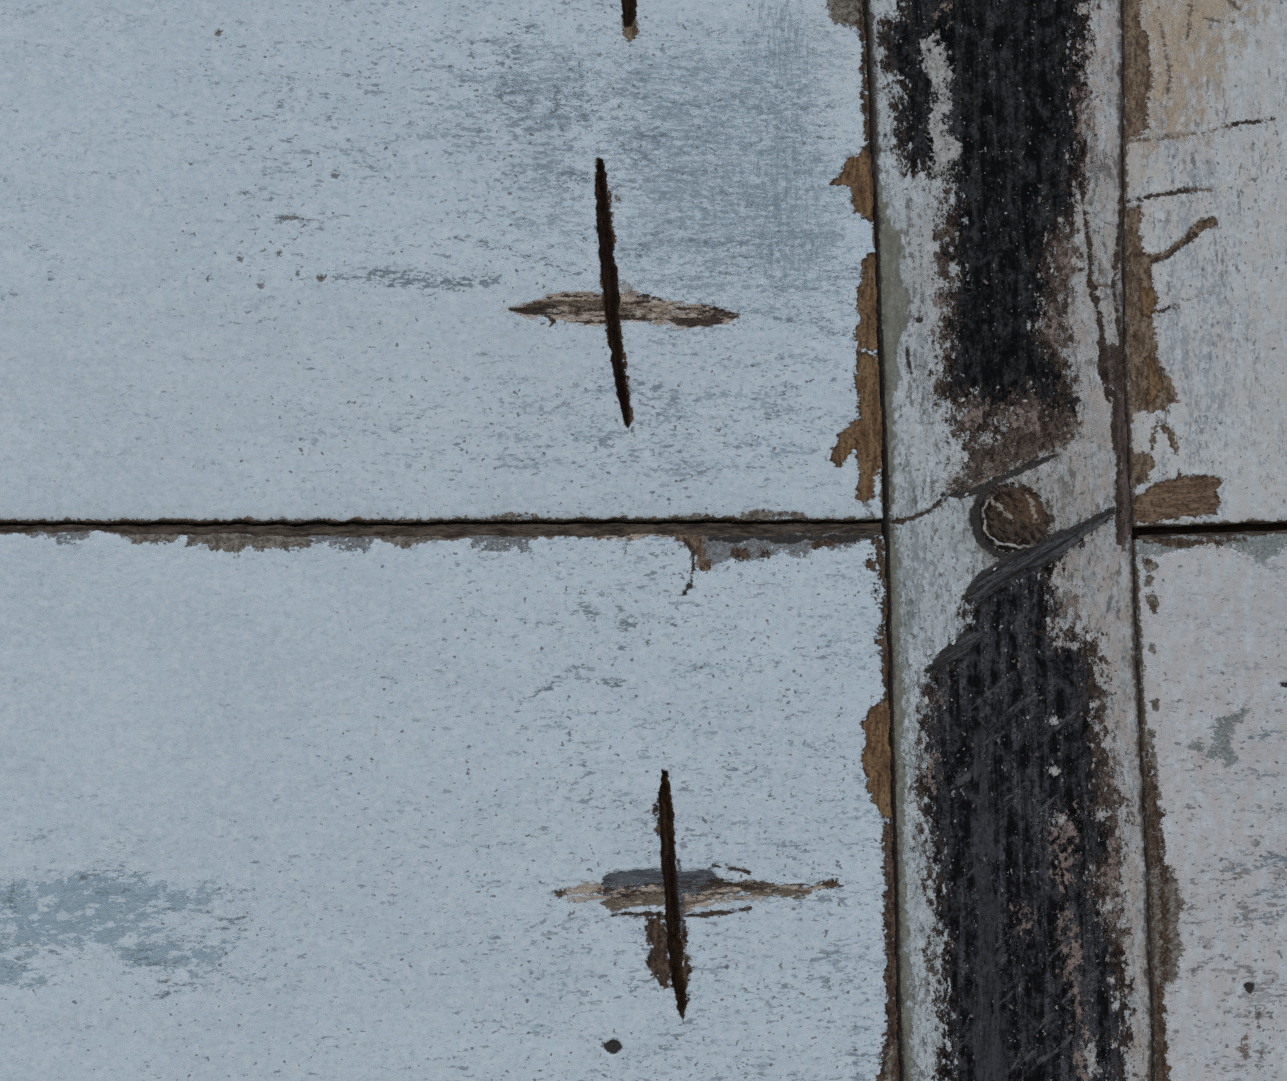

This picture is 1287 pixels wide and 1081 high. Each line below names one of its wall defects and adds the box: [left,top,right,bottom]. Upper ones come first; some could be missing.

crack [620,0,640,43]
peeling [1124,0,1156,139]
crack [503,157,740,428]
peeling [620,237,814,281]
peeling [763,0,1102,498]
peeling [30,530,92,549]
peeling [123,533,441,558]
peeling [468,512,533,553]
peeling [702,204,1287,1081]
crack [554,769,847,1022]